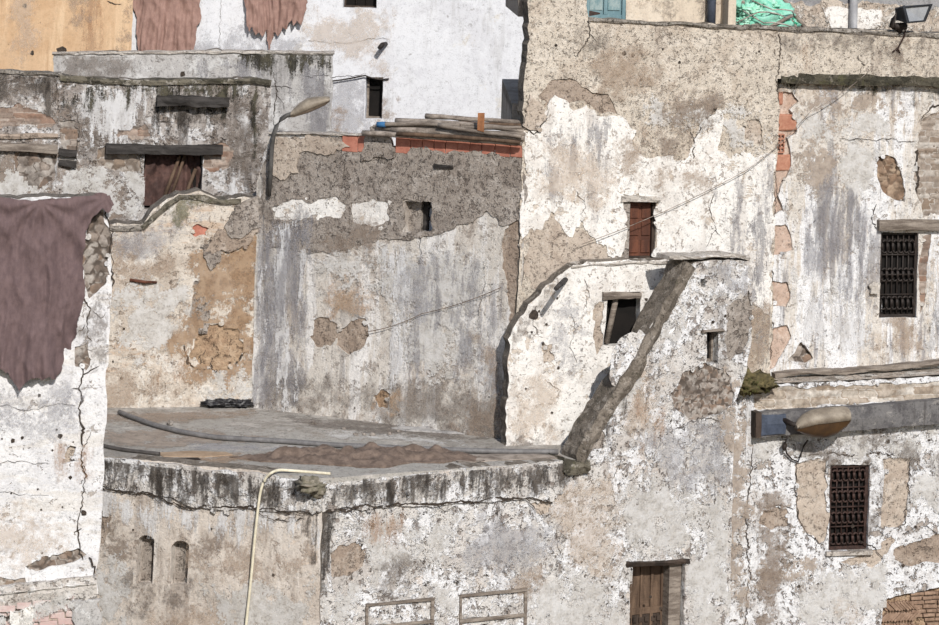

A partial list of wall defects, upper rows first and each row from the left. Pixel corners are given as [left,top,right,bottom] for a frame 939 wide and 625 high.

flaking render [790,0,939,32]
crack [104,211,115,287]
crack [77,298,105,341]
crack [183,345,248,375]
spalling [310,317,369,355]
peeling [502,75,939,625]
crack [3,362,563,576]
water stain [332,479,395,505]
water stain [406,471,465,503]
water stain [532,467,547,494]
water stain [101,459,330,586]
spalling [0,548,86,585]